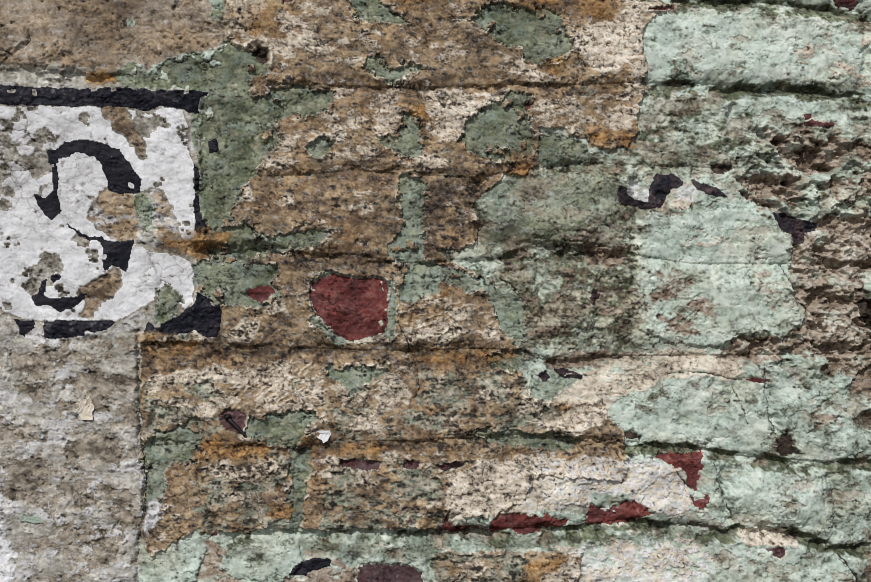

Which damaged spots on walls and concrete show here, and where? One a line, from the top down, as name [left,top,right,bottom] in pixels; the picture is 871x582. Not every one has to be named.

spalling [103,106,144,158]
peeling [112,42,333,309]
spalling [90,190,175,241]
spalling [80,270,120,318]
peeling [307,174,604,403]
crack [667,364,781,436]
peeling [315,430,331,443]
flaking render [340,458,381,471]
flaking render [437,513,568,534]
flaking render [584,486,652,525]
flaking render [654,448,710,512]
flaking render [356,563,423,582]